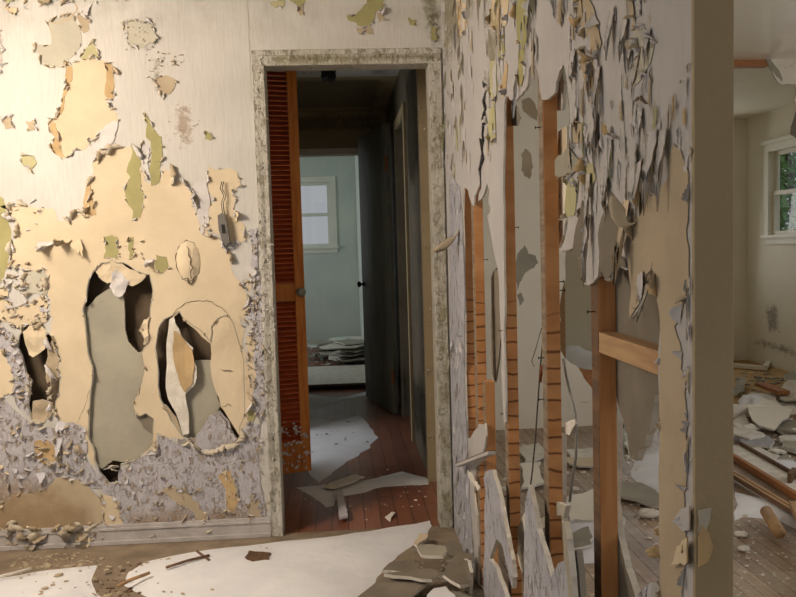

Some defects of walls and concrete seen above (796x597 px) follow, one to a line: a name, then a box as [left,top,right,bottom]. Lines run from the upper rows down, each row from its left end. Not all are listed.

peeling [0,0,310,551]
peeling [347,0,537,563]
peeling [547,0,691,597]